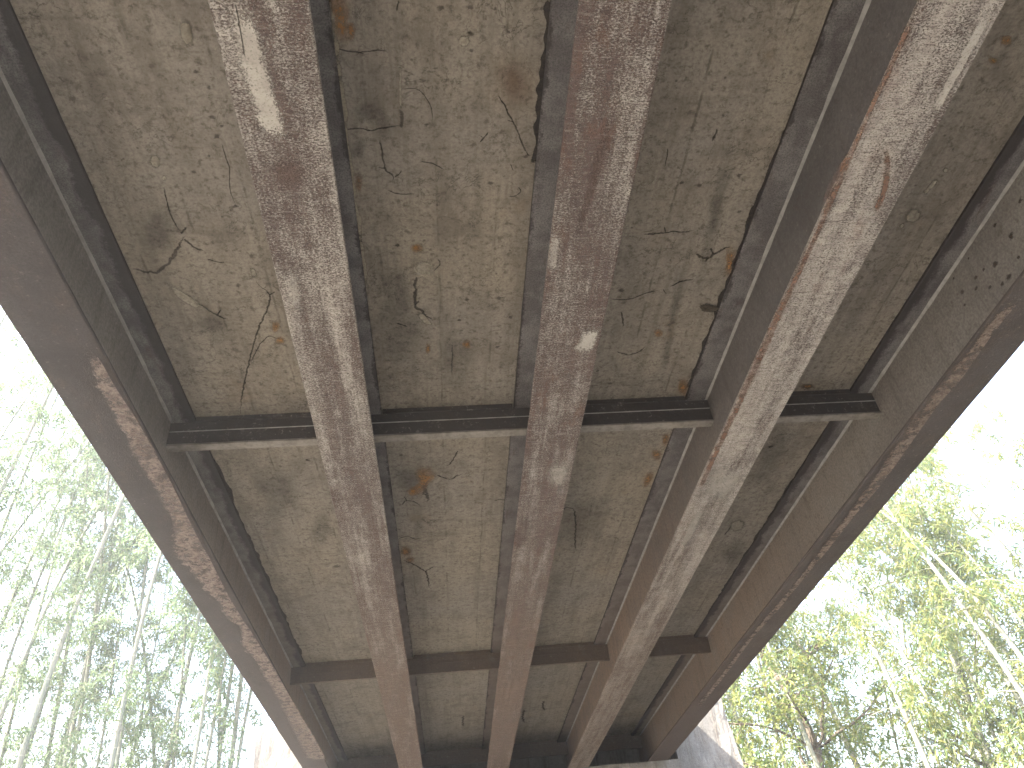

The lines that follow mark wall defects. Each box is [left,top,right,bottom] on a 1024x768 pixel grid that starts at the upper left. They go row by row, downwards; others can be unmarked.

crack [347,126,442,195]
crack [480,97,531,197]
crack [137,189,224,274]
crack [397,260,440,327]
corrosion [700,25,911,486]
crack [240,282,275,413]
crack [402,451,459,505]
peeling [90,356,327,760]
crack [399,536,433,585]